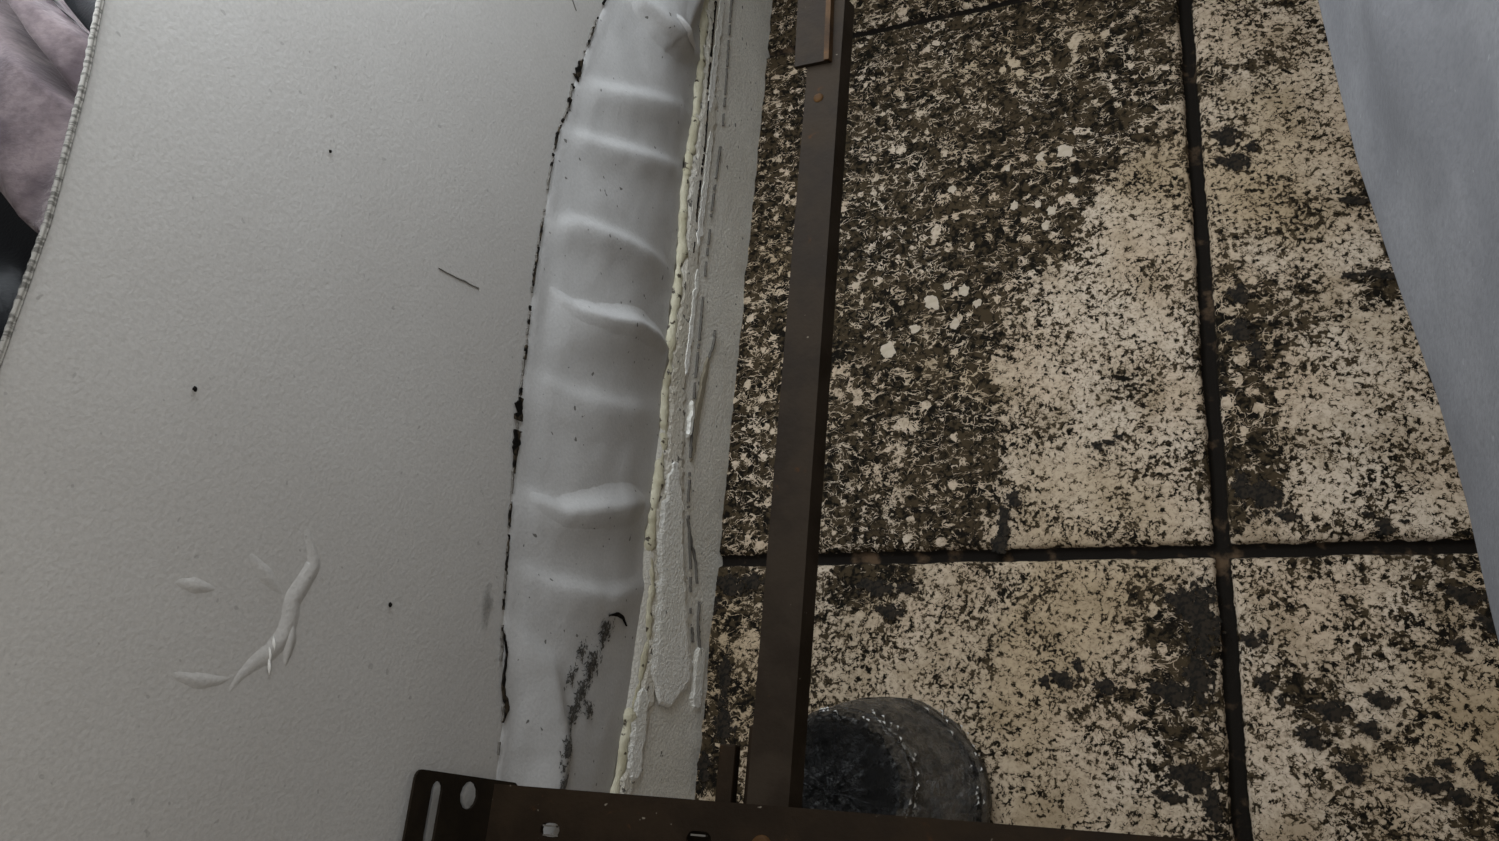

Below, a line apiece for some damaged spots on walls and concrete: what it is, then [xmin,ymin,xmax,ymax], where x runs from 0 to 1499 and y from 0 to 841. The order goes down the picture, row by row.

leakage [1209,125,1257,171]
leakage [1223,283,1266,360]
crack [497,0,607,755]
leakage [1091,434,1124,452]
leakage [989,488,1023,554]
leakage [559,612,627,789]
leakage [697,644,738,791]
leakage [1037,657,1123,696]
leakage [1145,566,1269,718]
leakage [1295,688,1402,787]
leakage [1151,758,1224,833]
leakage [1398,757,1499,808]